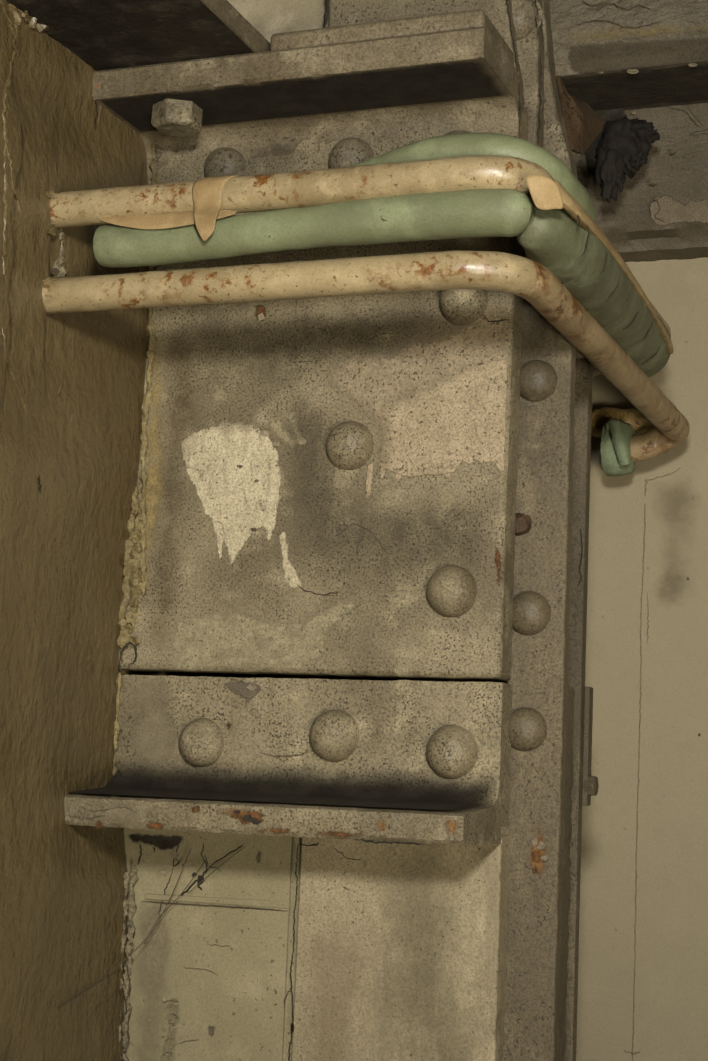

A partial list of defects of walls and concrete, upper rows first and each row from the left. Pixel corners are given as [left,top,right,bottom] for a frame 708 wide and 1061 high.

spalling [117,308,157,649]
peeling [181,412,307,588]
spalling [111,673,123,776]
leakage [129,834,182,864]
rust [229,810,291,833]
spalling [119,862,139,1061]
crack [141,842,361,1061]